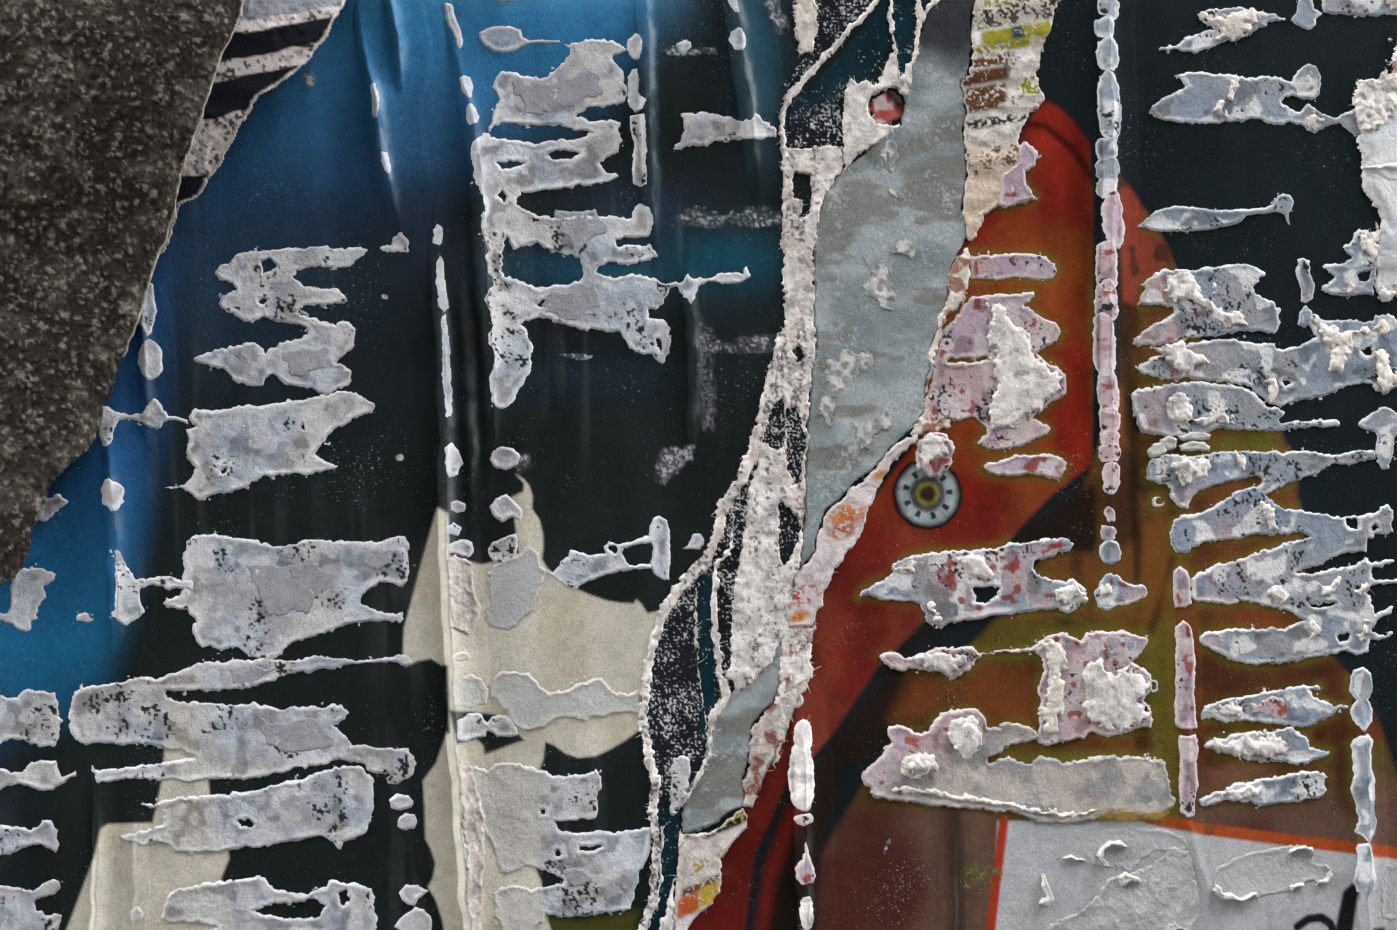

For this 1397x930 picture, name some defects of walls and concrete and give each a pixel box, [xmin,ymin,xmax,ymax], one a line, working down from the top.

peeling [370,83,380,117]
peeling [673,111,777,152]
peeling [381,151,391,173]
peeling [99,232,409,500]
peeling [860,0,1397,930]
peeling [38,494,68,522]
peeling [101,478,124,511]
peeling [787,659,816,930]